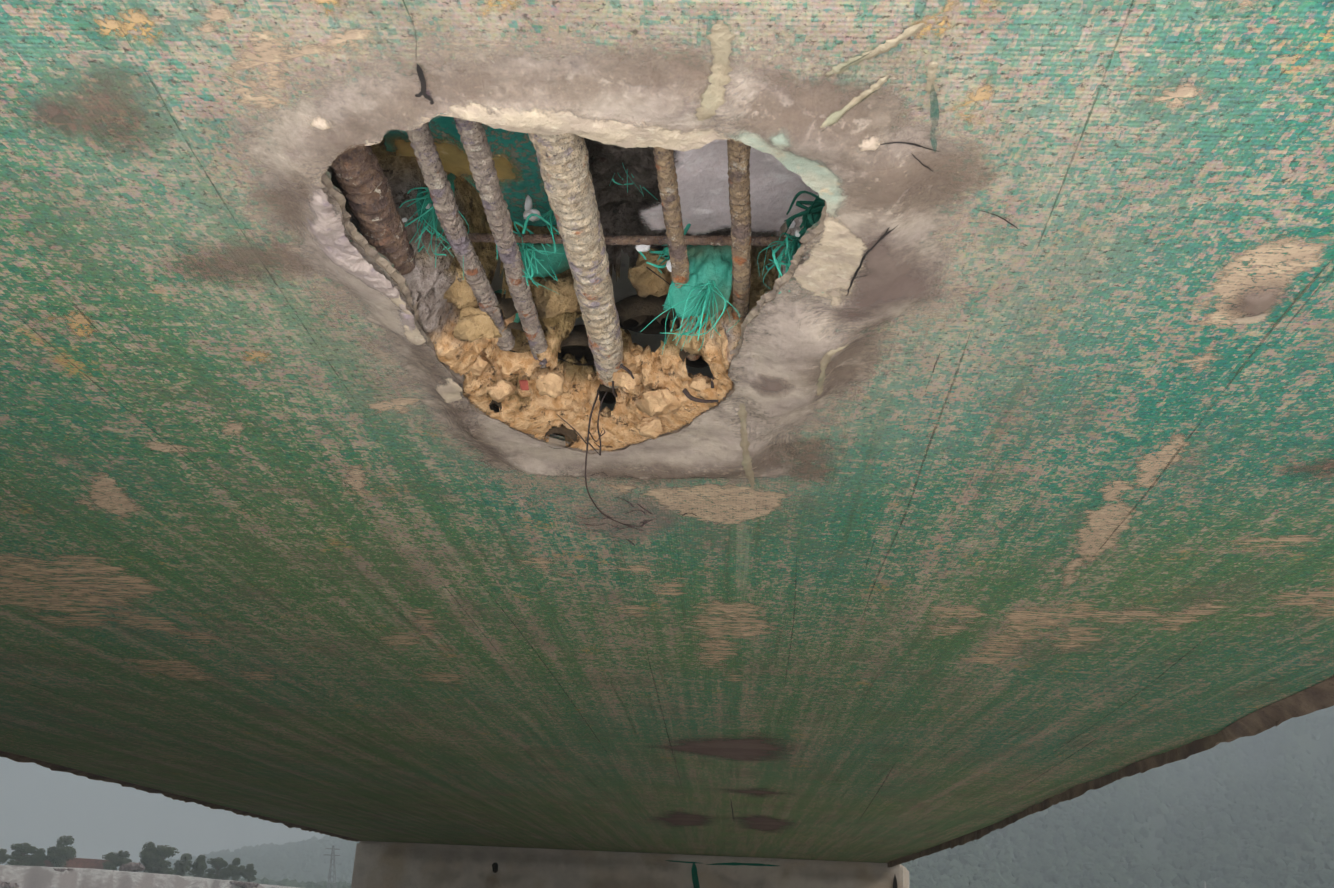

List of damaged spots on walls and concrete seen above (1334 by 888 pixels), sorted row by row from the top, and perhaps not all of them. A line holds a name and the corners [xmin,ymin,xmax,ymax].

damp [750,85,878,145]
damp [852,152,987,211]
spalling [308,103,867,455]
crack [847,225,898,295]
damp [838,229,931,320]
damp [810,339,868,396]
damp [660,737,789,761]